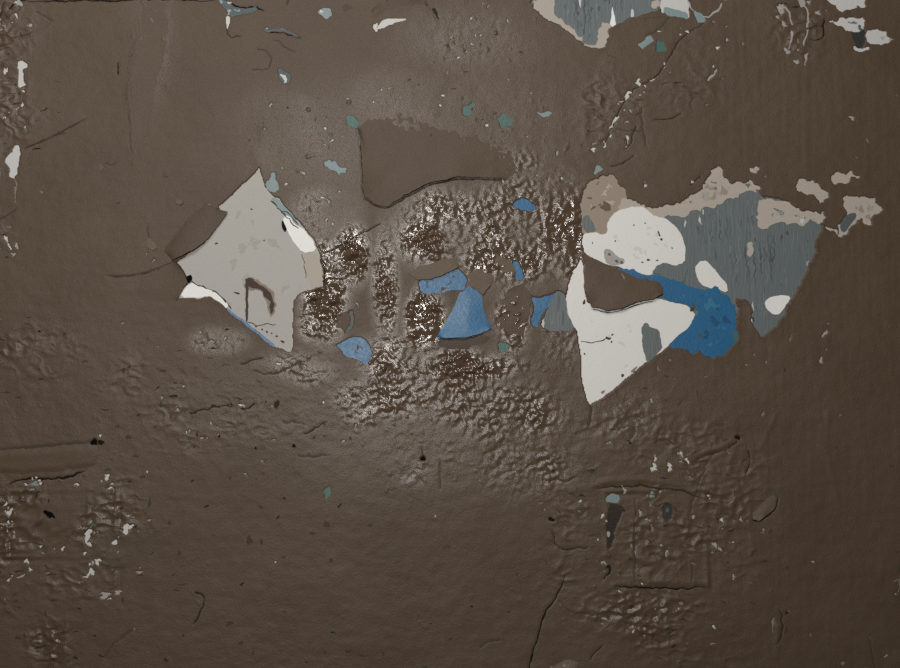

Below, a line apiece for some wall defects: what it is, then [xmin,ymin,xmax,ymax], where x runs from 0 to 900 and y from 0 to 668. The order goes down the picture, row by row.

crack [0,0,300,71]
peeling [531,0,722,58]
peeling [776,0,891,64]
crack [321,128,505,286]
peeling [164,167,323,352]
peeling [409,165,882,404]
peeling [336,310,372,364]
spalling [0,482,42,534]
crack [548,517,587,551]
crack [598,442,750,590]
crack [529,576,606,668]